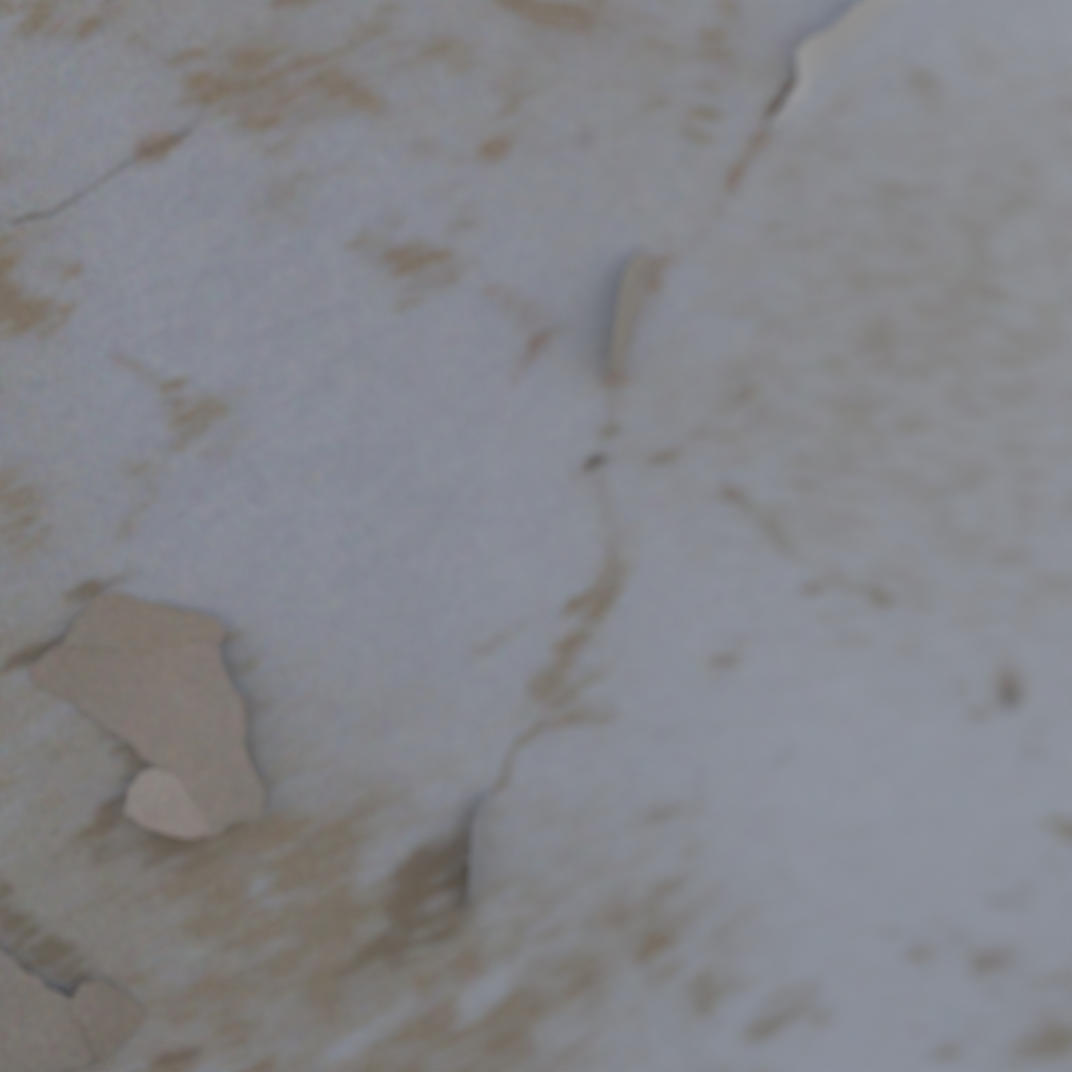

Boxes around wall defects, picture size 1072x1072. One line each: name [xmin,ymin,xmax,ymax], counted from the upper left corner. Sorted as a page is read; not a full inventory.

peeling [766,0,943,129]
crack [48,118,196,213]
peeling [0,148,90,360]
peeling [335,226,489,316]
peeling [581,230,683,399]
peeling [0,446,65,573]
flaking render [508,513,649,742]
peeling [0,563,741,1072]